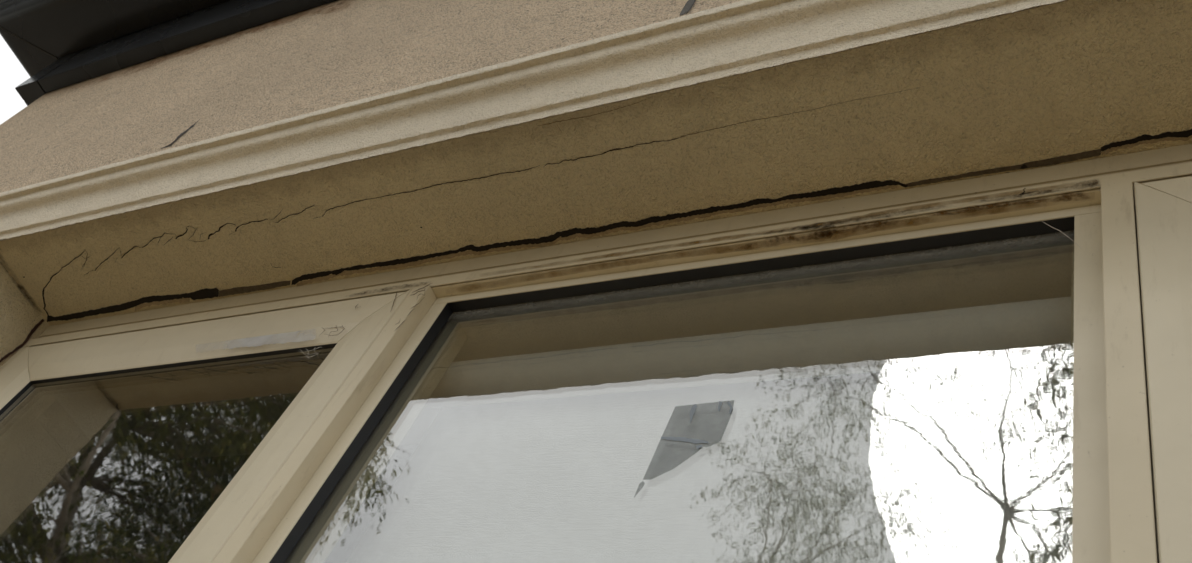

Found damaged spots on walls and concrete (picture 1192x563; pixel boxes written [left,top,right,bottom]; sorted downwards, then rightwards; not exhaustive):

crack [0,87,1192,362]